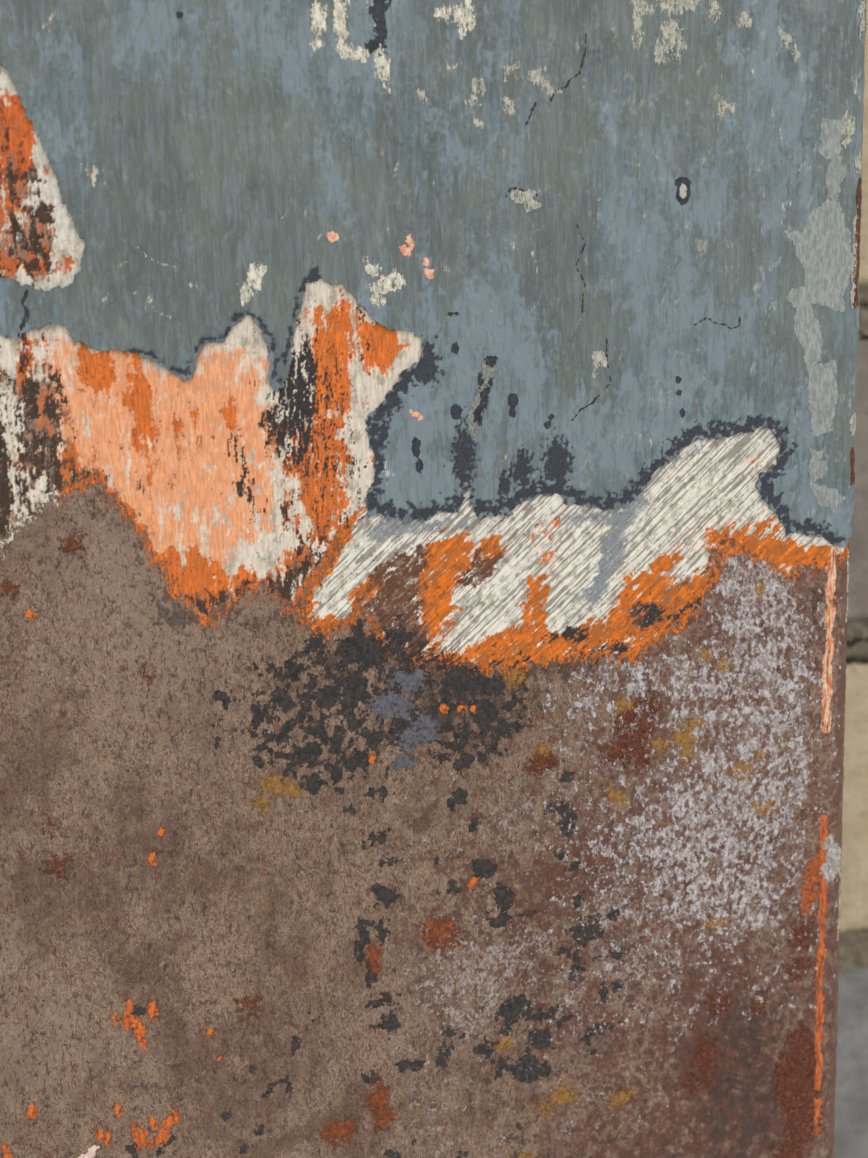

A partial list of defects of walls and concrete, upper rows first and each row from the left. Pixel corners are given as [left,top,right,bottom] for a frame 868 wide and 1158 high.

peeling [307,0,392,94]
peeling [434,0,477,40]
peeling [0,66,85,291]
peeling [675,177,691,205]
peeling [399,234,434,279]
peeling [0,256,849,679]
corrosion [523,749,565,780]
corrosion [597,690,668,776]
corrosion [421,916,464,956]
corrosion [783,849,827,982]
corrosion [320,1072,397,1148]
corrosion [770,1020,825,1158]